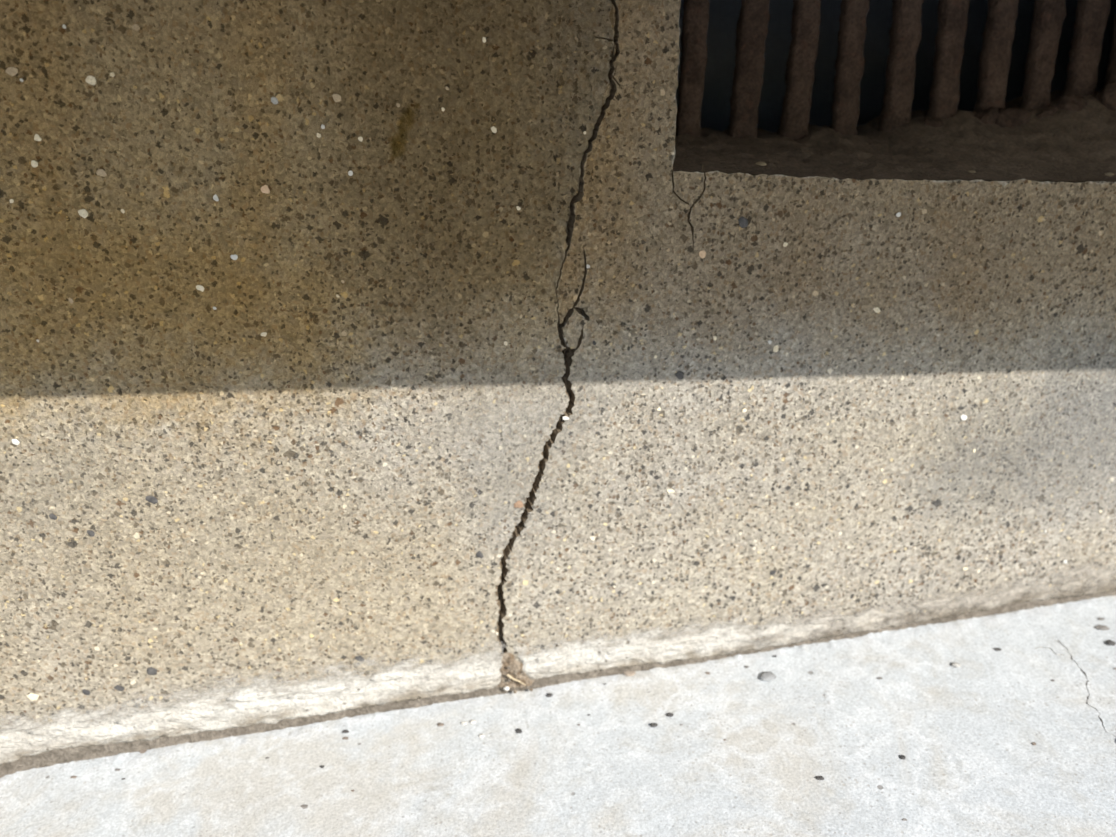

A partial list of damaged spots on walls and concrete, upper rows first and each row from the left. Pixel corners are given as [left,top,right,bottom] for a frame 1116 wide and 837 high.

crack [495,0,623,655]
crack [1035,638,1116,737]